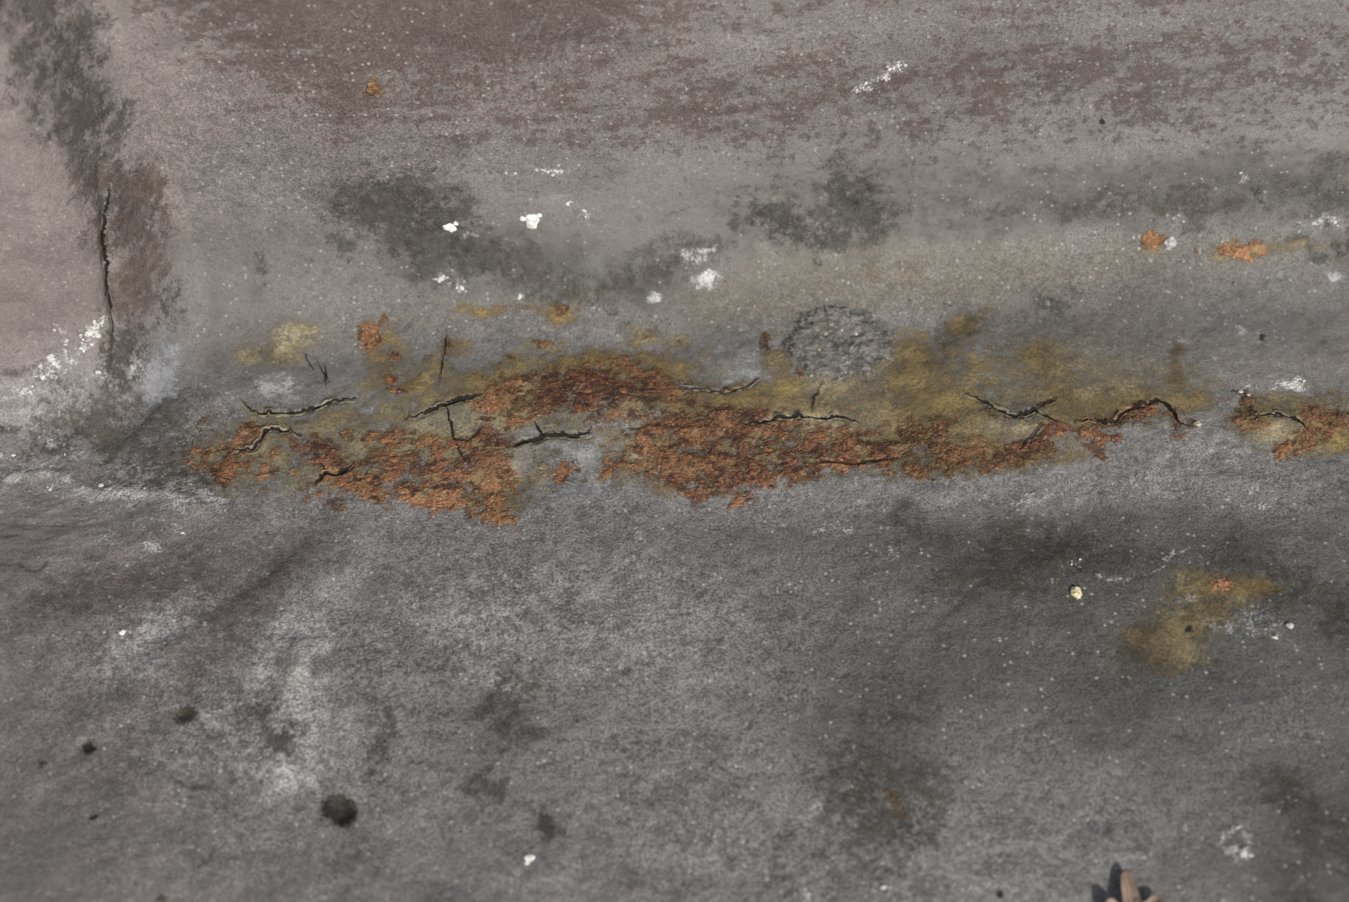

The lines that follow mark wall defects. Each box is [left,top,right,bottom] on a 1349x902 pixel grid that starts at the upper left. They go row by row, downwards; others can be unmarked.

crack [101,188,114,336]
water stain [0,0,231,553]
water stain [327,164,726,316]
water stain [728,153,910,266]
rust [1194,238,1312,263]
crack [228,354,357,455]
crack [405,333,483,461]
crack [507,422,594,451]
rust [174,314,1213,532]
crack [964,393,1193,449]
rust [1229,388,1349,462]
rust [1162,569,1284,608]